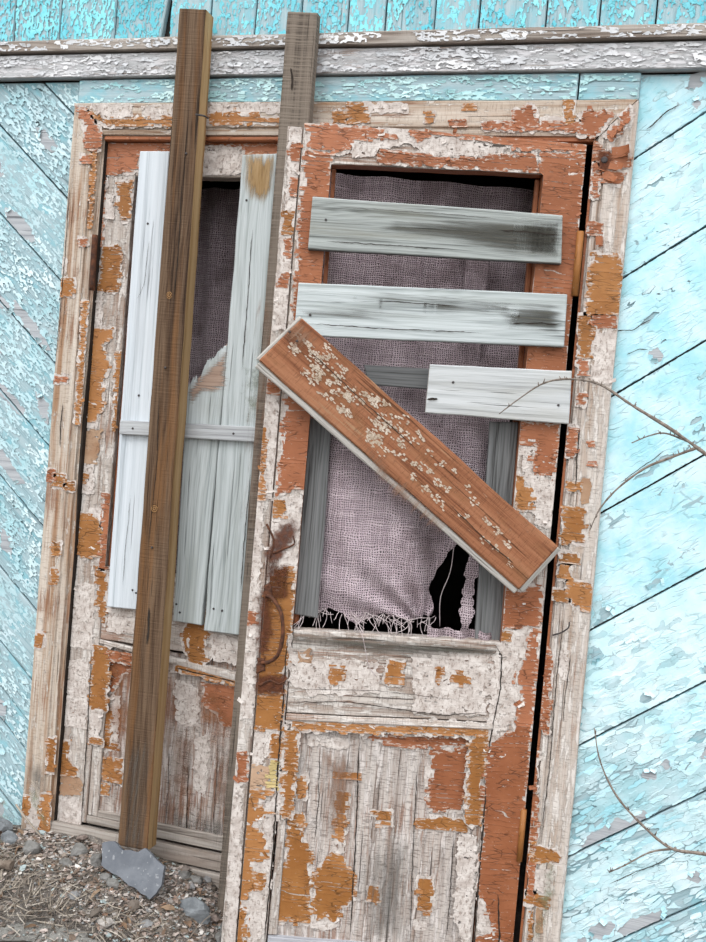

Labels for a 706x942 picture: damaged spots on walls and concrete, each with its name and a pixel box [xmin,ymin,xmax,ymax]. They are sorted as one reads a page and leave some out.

peeling [205,100,637,383]
peeling [257,378,310,519]
peeling [34,629,47,650]
peeling [83,644,132,796]
peeling [0,735,223,942]
peeling [170,609,244,730]
corrosion [256,523,295,659]
peeling [233,421,616,942]
peeling [581,810,649,848]
peeling [577,905,668,942]
peeling [637,759,674,780]
peeling [682,869,705,883]